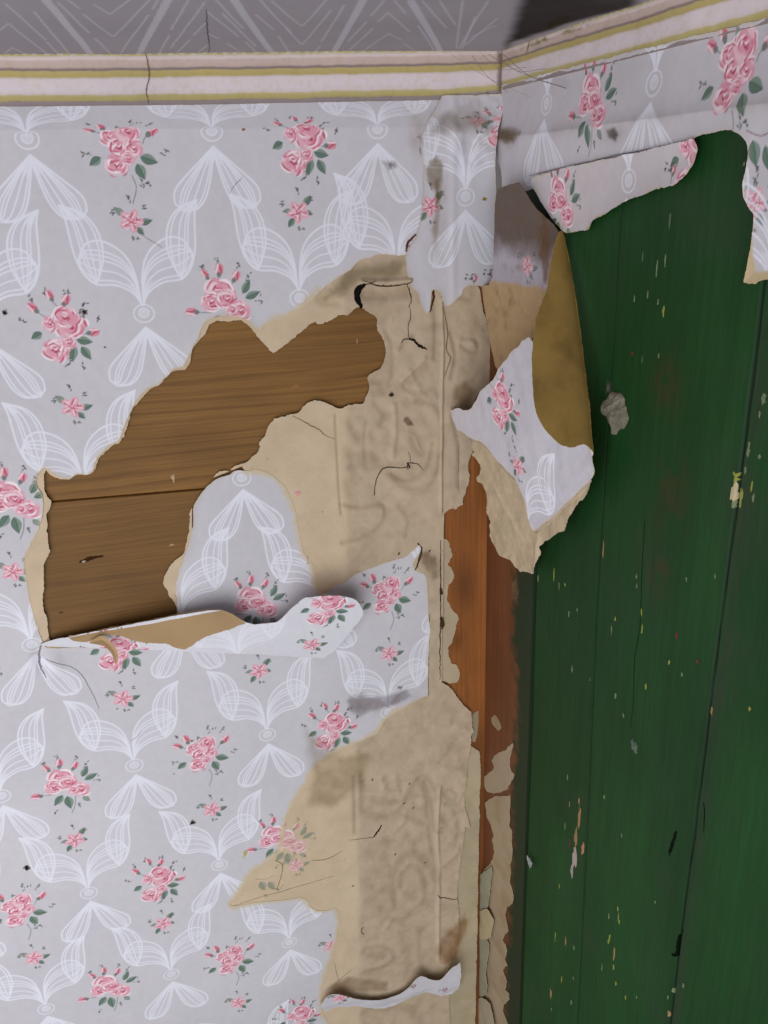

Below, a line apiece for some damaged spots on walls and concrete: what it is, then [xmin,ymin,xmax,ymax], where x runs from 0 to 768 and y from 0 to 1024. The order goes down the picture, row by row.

crack [143,54,151,102]
crack [363,280,451,378]
crack [374,452,423,495]
peeling [230,254,494,1024]